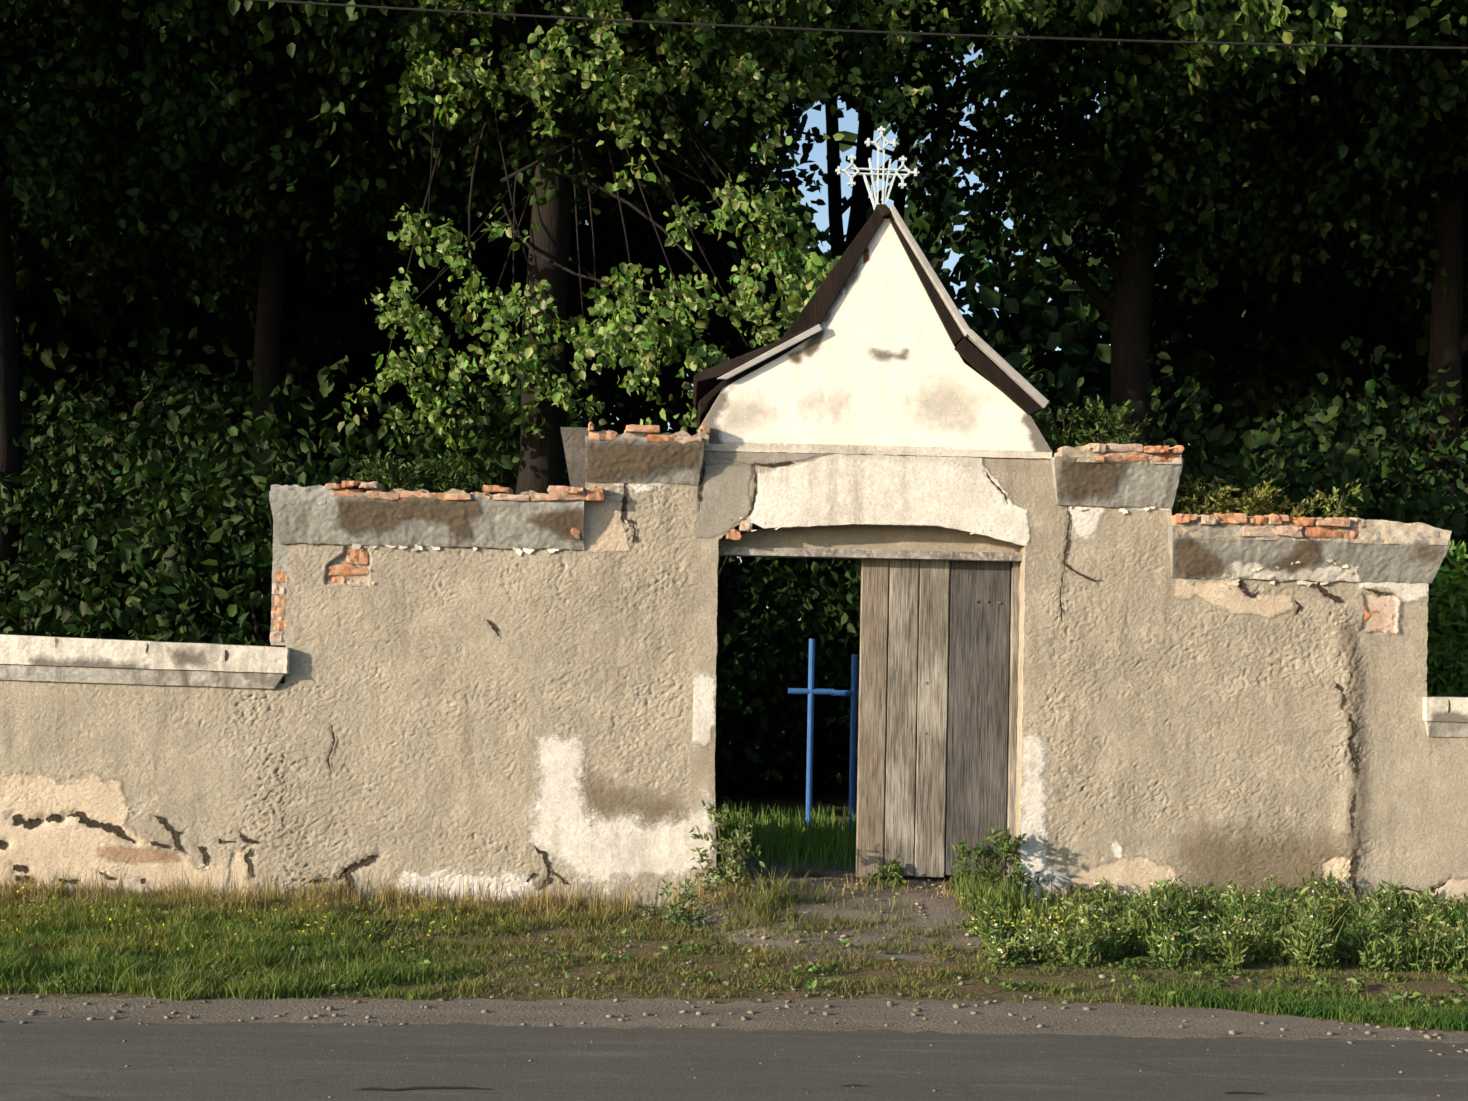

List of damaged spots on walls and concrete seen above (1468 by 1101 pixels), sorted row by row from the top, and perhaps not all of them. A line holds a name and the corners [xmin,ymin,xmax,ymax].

crack [617,483,637,544]
flaking render [327,544,440,586]
crack [1059,506,1104,622]
spalling [1174,559,1429,636]
spalling [0,767,252,898]